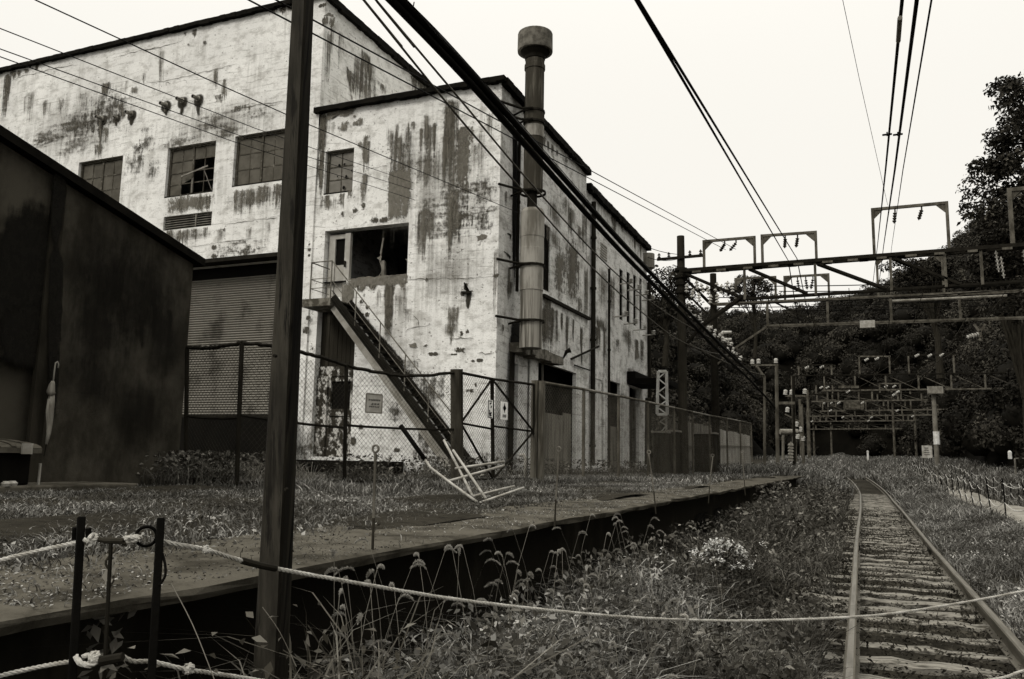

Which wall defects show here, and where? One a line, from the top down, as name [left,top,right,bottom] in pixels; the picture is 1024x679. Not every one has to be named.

leakage [347,50,386,98]
leakage [34,82,126,156]
leakage [234,184,281,214]
leakage [316,114,352,210]
leakage [388,96,518,300]
leakage [546,199,587,247]
leakage [360,285,449,406]
leakage [445,307,459,342]
leakage [542,269,644,371]